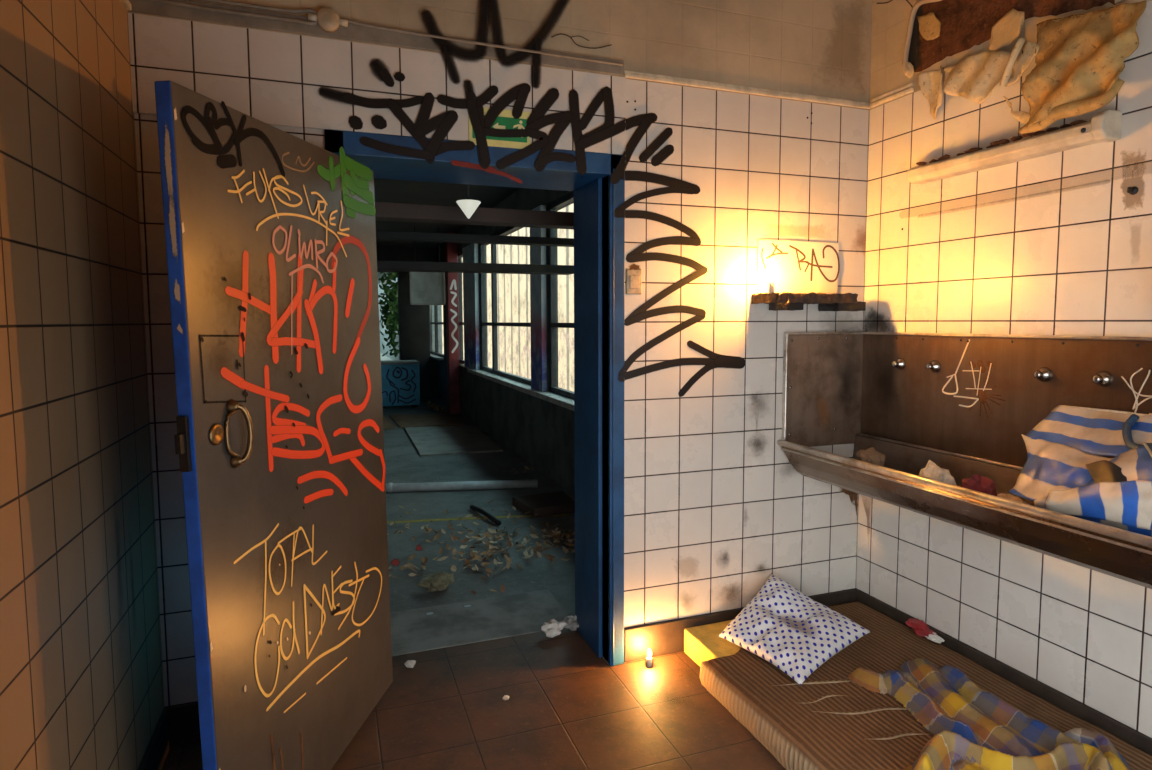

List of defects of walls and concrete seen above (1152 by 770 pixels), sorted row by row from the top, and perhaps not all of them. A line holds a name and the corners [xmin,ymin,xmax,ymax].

peeling [902,0,1147,166]